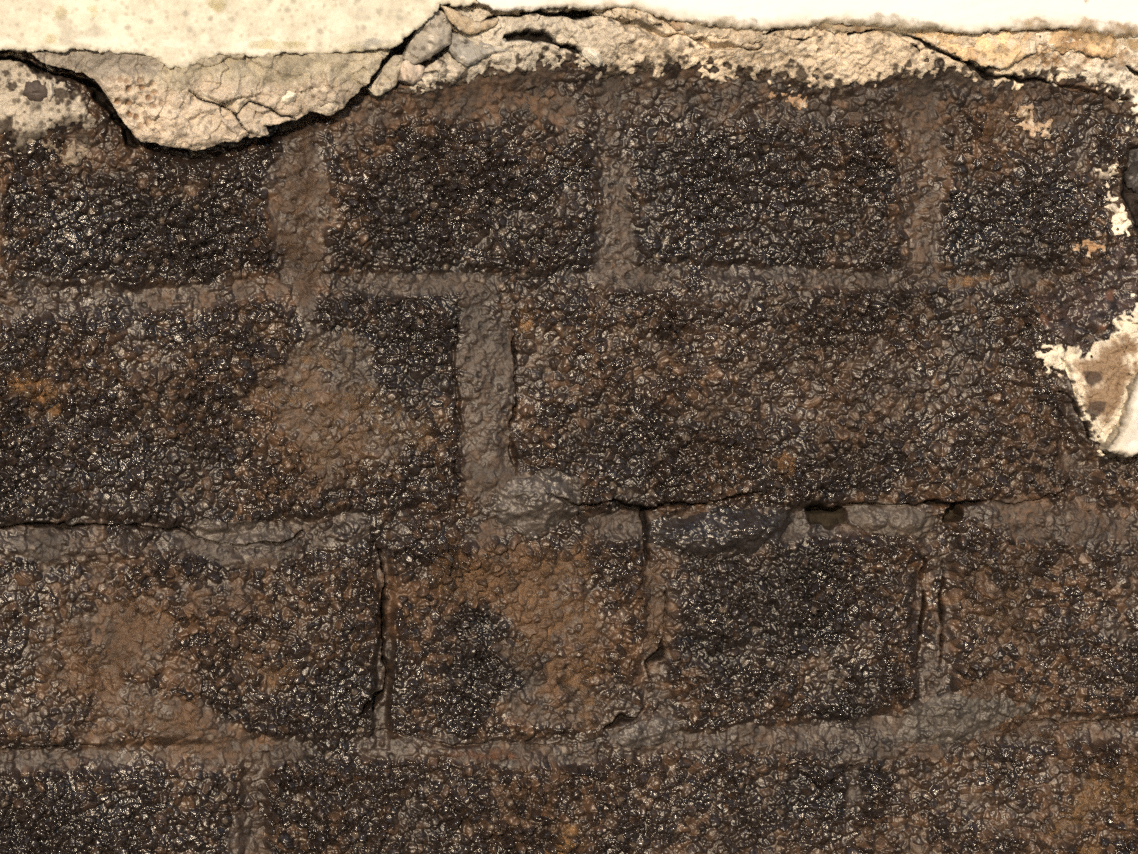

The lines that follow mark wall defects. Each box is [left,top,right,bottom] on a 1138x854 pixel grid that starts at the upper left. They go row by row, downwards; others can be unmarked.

crack [0,56,137,147]
crack [195,95,296,134]
spalling [0,4,1138,167]
crack [847,29,1047,83]
spalling [1072,164,1138,258]
spalling [1034,293,1138,457]
crack [0,522,115,530]
crack [581,491,760,560]
crack [910,498,980,506]
crack [362,545,387,711]
crack [644,640,665,675]
crack [917,584,942,657]